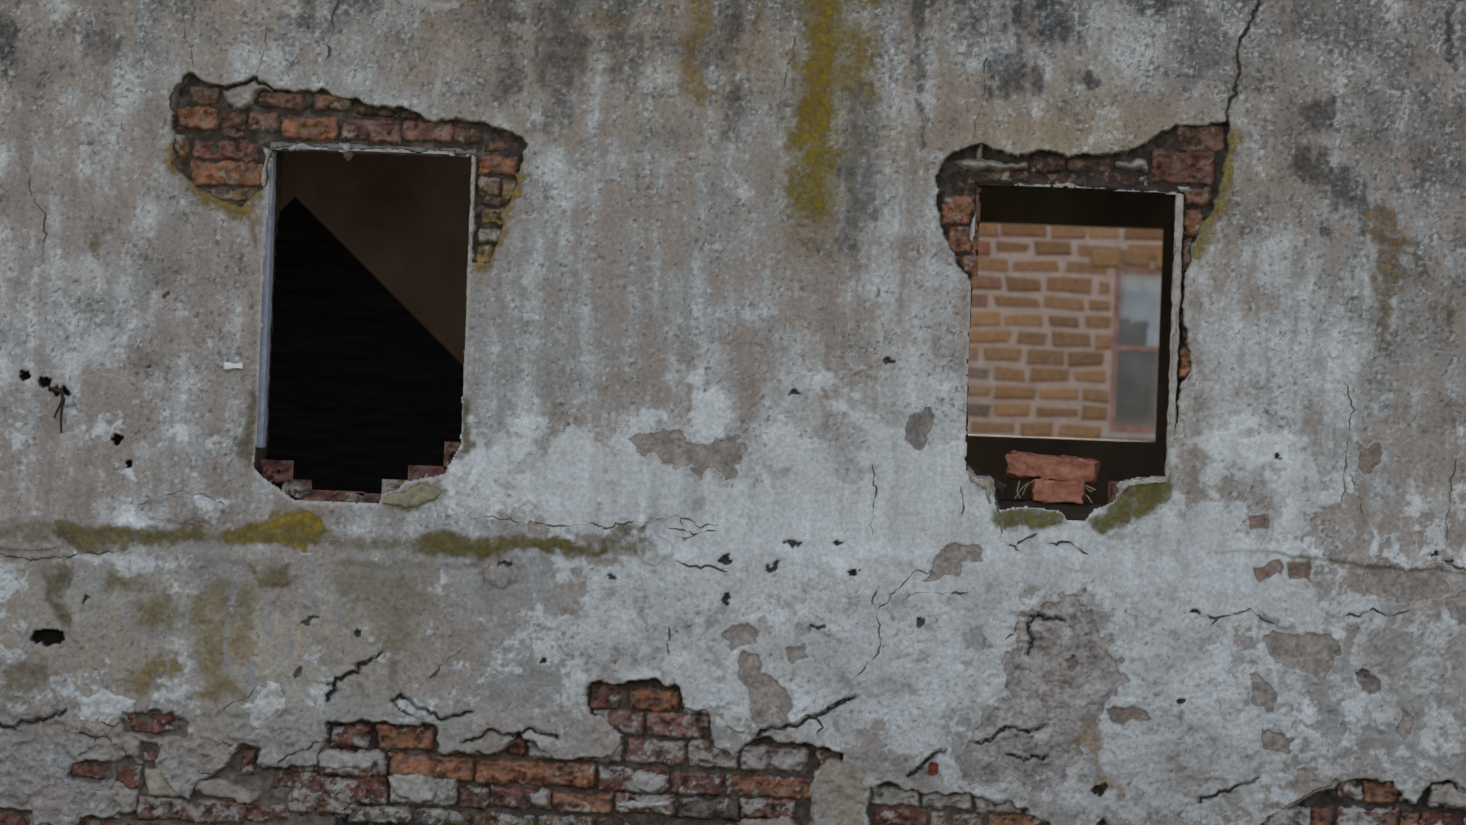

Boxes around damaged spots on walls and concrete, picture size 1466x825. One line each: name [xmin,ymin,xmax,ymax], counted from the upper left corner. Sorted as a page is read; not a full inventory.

damp [793,0,876,215]
crack [1226,4,1259,125]
crack [19,157,48,263]
spalling [170,60,527,263]
spalling [936,122,1230,428]
spalling [0,588,1150,825]
peeling [1251,673,1277,712]
peeling [1261,729,1294,753]
peeling [1263,630,1342,681]
peeling [1357,676,1381,694]
spalling [1262,779,1466,825]